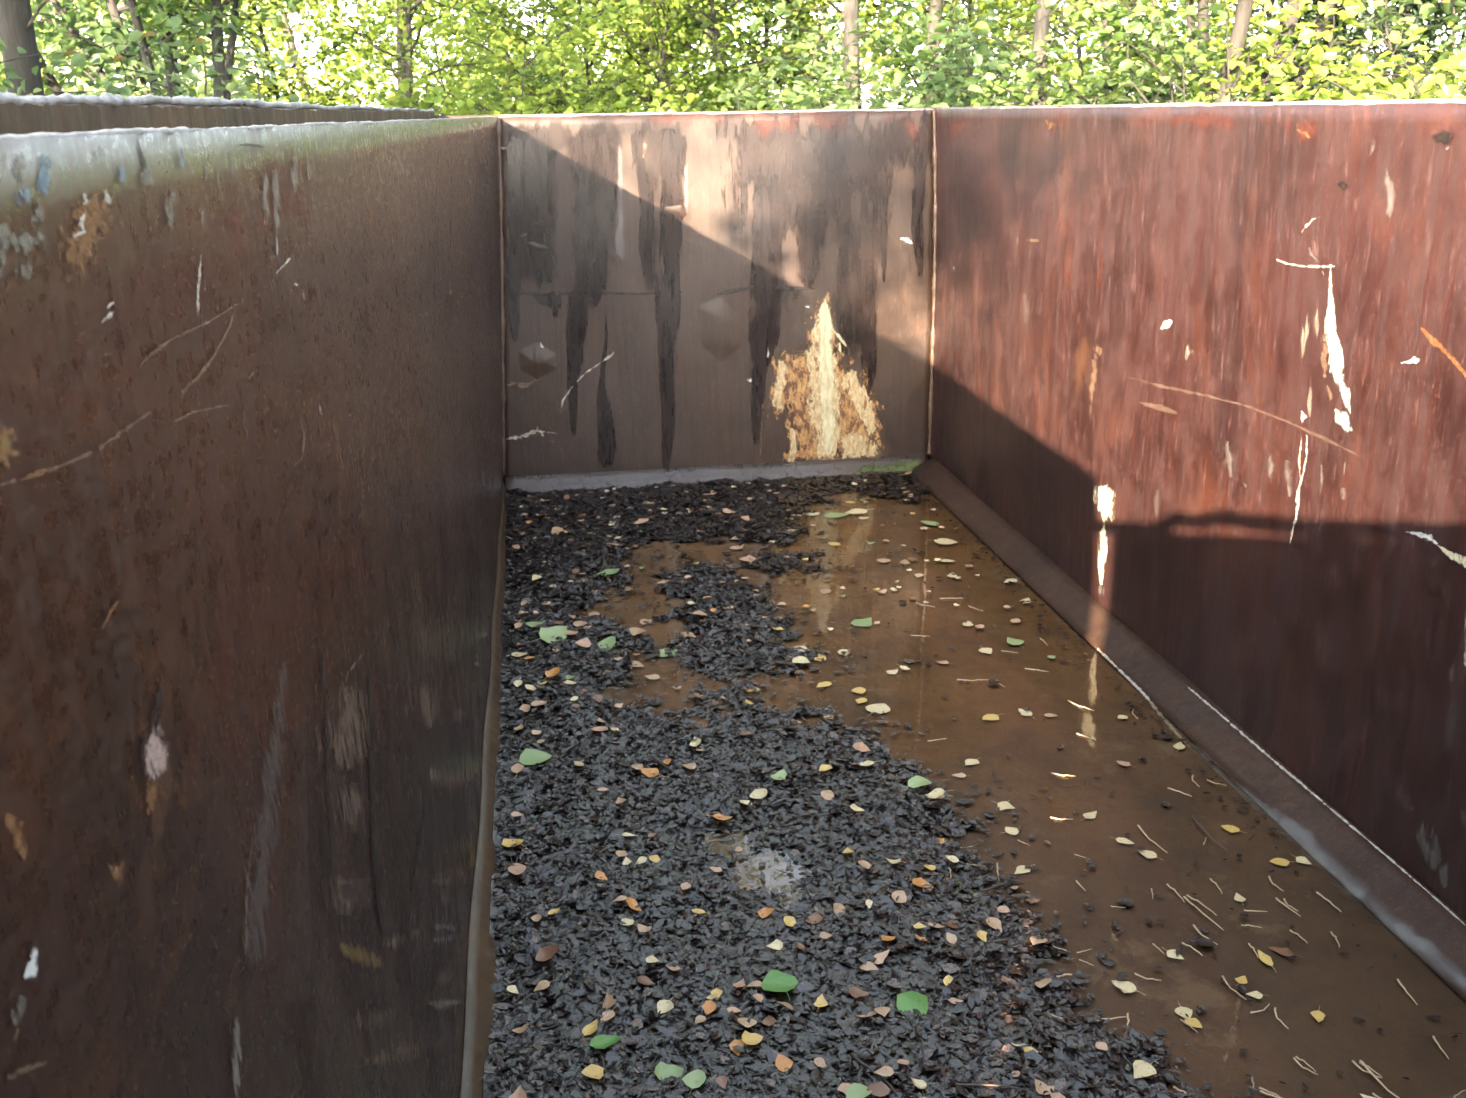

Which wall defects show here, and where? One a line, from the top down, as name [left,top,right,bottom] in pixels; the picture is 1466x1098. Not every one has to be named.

corrosion [0,426,19,469]
peeling [0,152,51,279]
corrosion [60,189,114,282]
water stain [506,123,687,468]
water stain [716,105,929,444]
peeling [763,292,884,462]
peeling [1301,268,1352,431]
peeling [1405,531,1466,568]